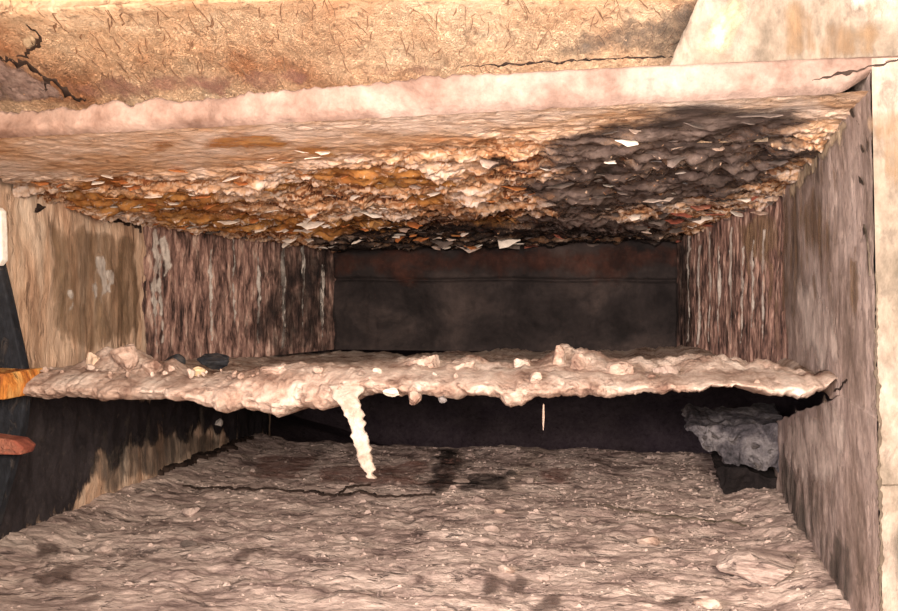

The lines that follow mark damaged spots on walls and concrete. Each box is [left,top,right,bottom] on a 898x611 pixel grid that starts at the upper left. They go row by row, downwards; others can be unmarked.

crack [0,0,684,102]
crack [812,59,898,81]
peeling [601,129,688,184]
water stain [52,224,139,348]
water stain [151,230,172,343]
peeling [31,175,482,253]
peeling [498,237,538,249]
water stain [782,189,838,370]
hole [270,406,353,443]
spalling [359,386,833,454]
crack [158,436,436,498]
water stain [781,401,849,601]